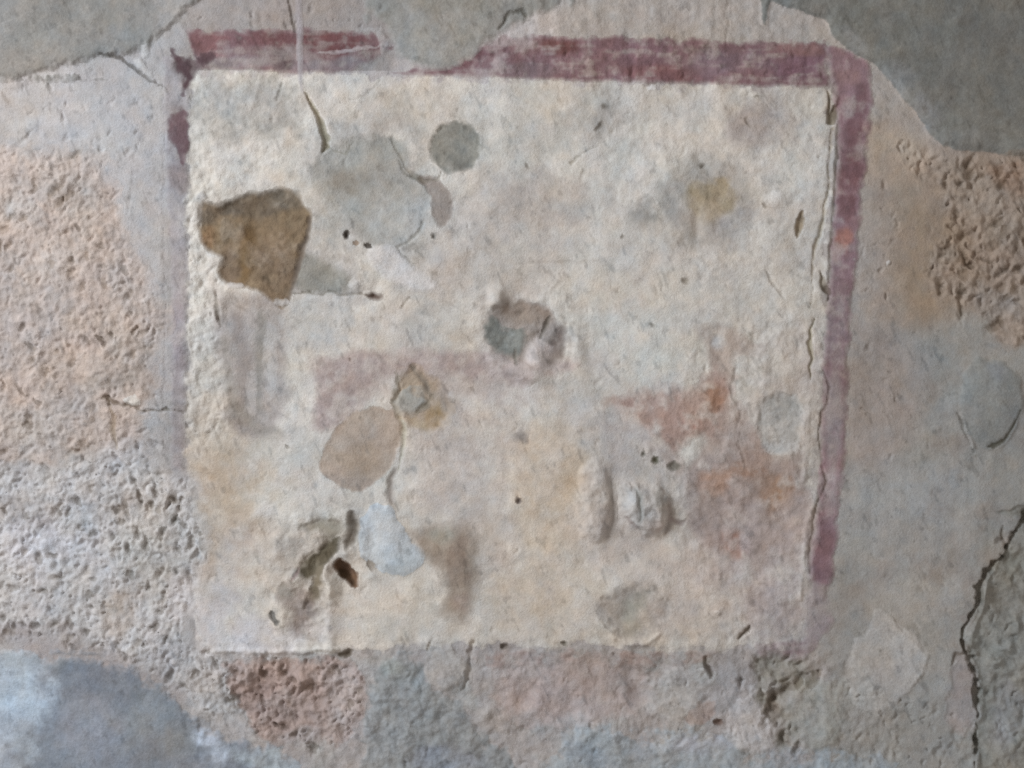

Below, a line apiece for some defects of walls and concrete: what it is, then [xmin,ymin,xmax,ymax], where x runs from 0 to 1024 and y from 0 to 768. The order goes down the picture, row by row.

crack [276,78,354,155]
flaking render [0,140,370,755]
crack [766,91,838,574]
flaking render [921,148,1024,354]
crack [951,508,1024,768]